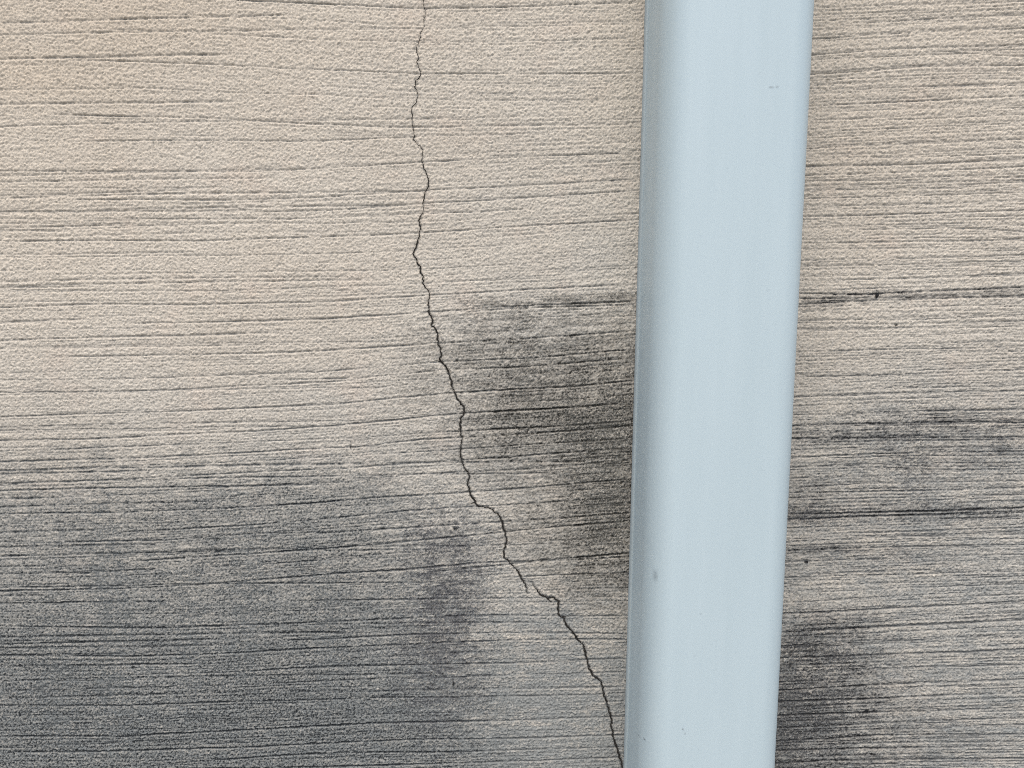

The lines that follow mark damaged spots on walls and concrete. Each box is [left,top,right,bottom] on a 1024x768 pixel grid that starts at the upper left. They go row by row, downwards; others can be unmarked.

damp [0,463,510,768]
crack [411,0,623,768]
damp [455,318,635,595]
damp [775,611,911,768]
damp [795,410,978,454]
damp [788,485,1022,524]